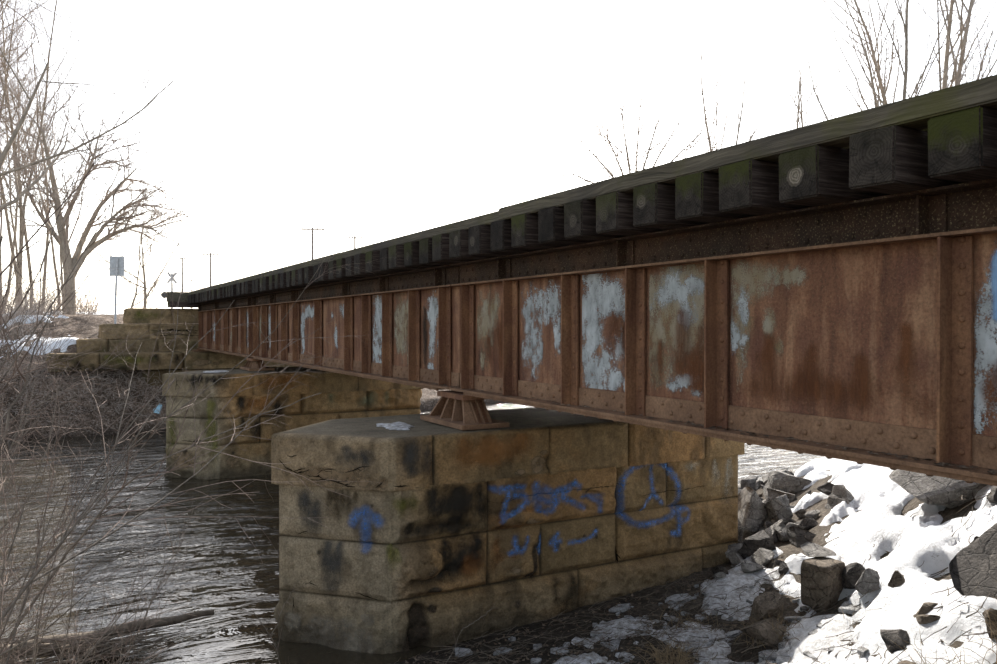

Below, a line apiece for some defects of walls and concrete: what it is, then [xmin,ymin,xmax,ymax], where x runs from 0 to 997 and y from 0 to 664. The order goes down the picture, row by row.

peeling [521,280,561,378]
peeling [582,273,625,391]
peeling [649,263,704,396]
rust [677,310,704,390]
peeling [974,267,997,434]
crack [280,455,407,488]